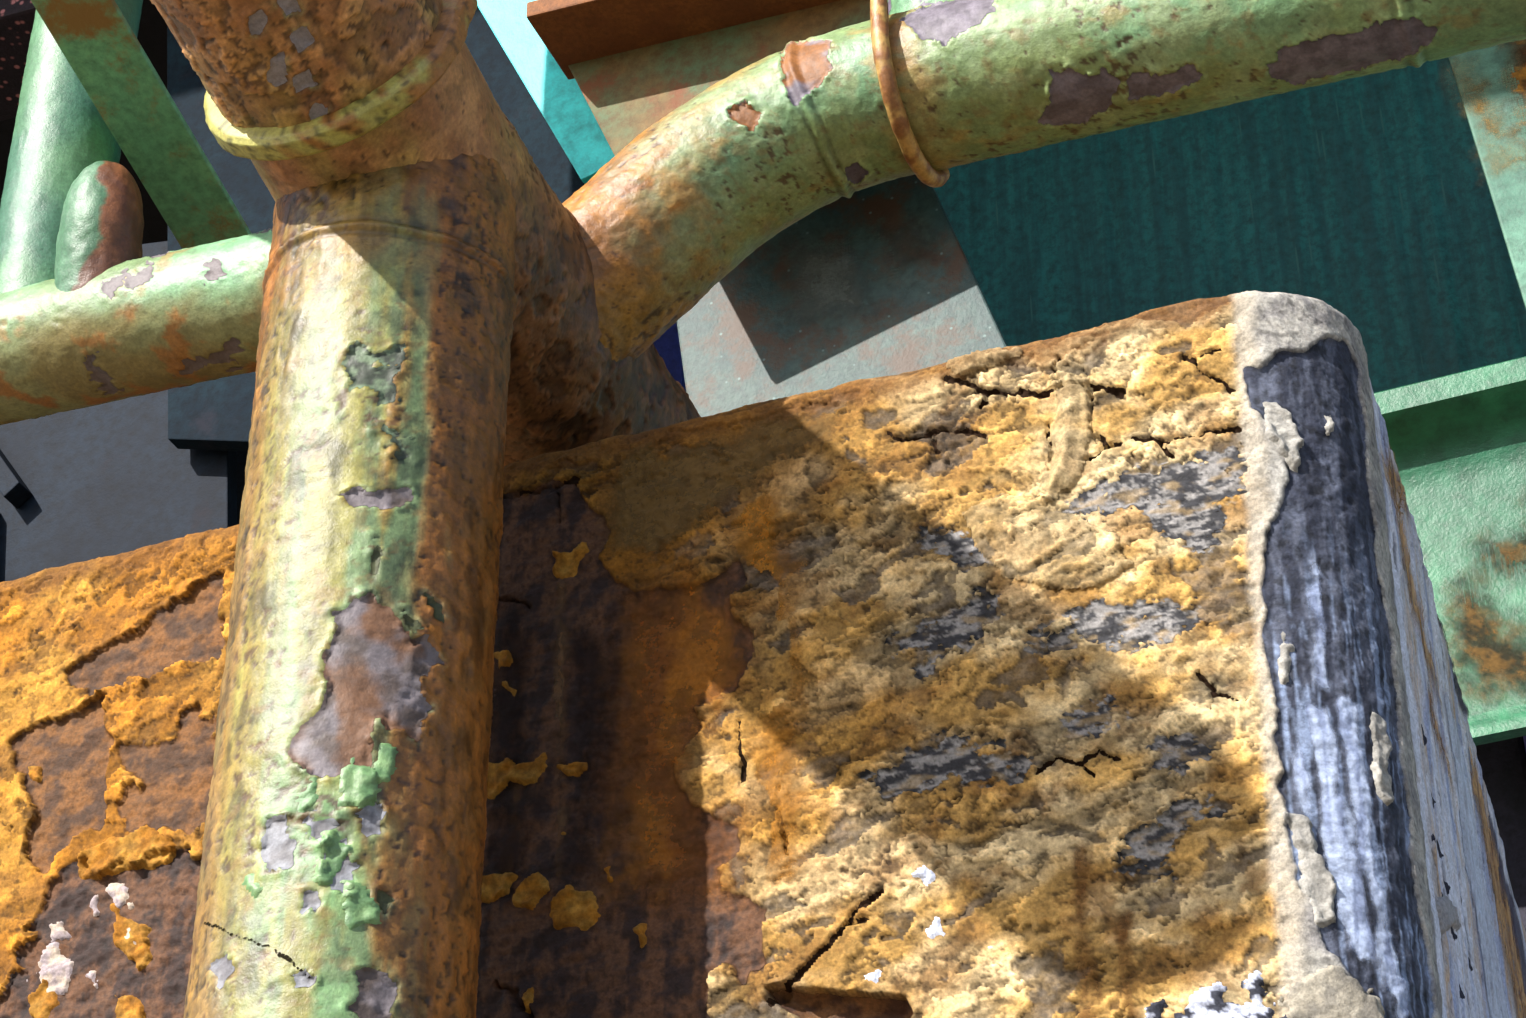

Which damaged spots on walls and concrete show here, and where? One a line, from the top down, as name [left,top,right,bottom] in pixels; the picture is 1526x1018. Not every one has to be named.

peeling [1267,17,1438,86]
rust [1504,39,1526,130]
crack [886,358,1061,454]
crack [1085,348,1242,462]
rust [1478,535,1526,574]
rust [1448,590,1526,697]
spalling [0,573,225,1018]
peeling [242,592,444,930]
leakage [1294,564,1409,1018]
crack [766,889,884,1007]
peeling [864,969,882,983]
peeling [925,917,945,939]